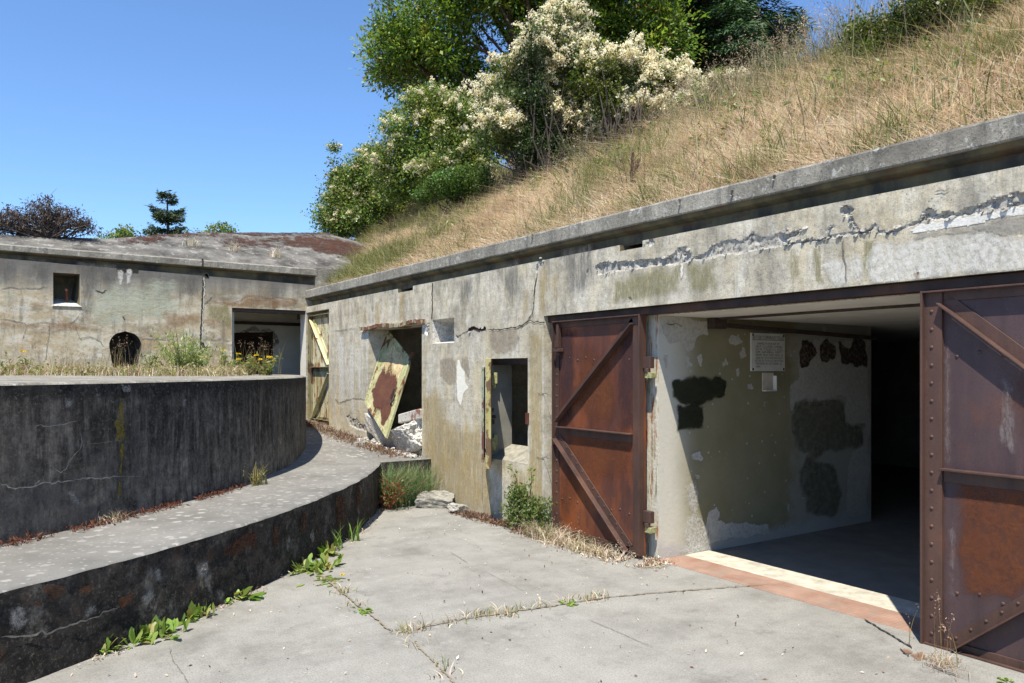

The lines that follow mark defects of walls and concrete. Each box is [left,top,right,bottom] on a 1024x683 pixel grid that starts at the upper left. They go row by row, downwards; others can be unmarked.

spalling [585,225,809,275]
peeling [824,191,1024,284]
crack [459,273,545,336]
crack [1,421,140,490]
rust [372,363,397,425]
rust [565,441,626,508]
peeling [789,337,871,519]
peeling [685,474,769,553]